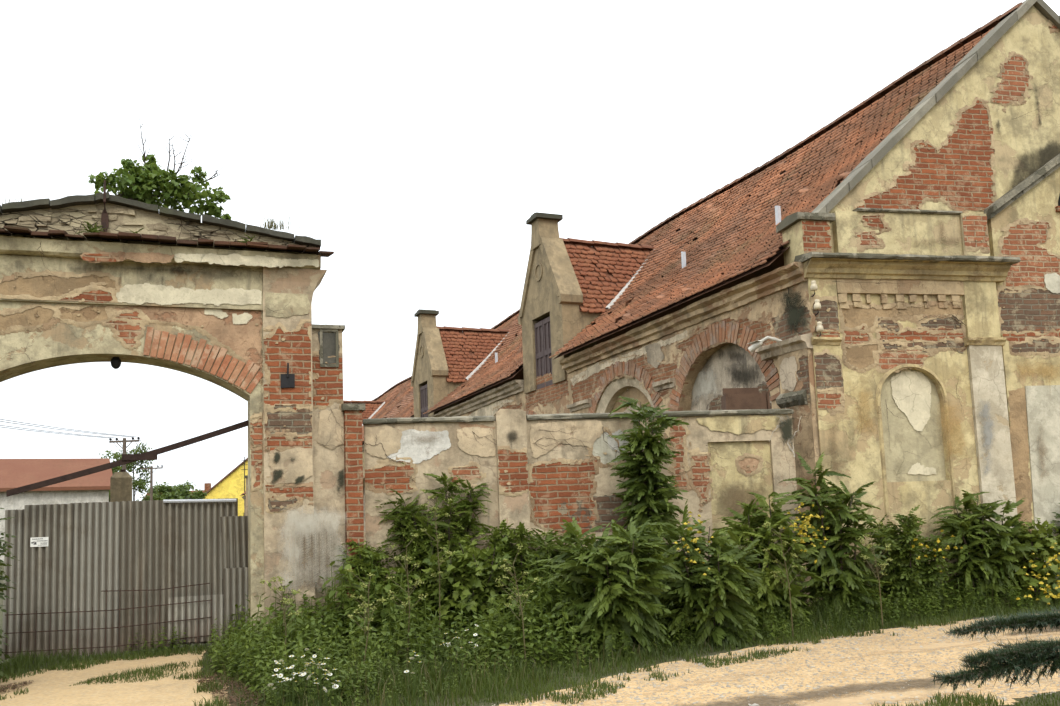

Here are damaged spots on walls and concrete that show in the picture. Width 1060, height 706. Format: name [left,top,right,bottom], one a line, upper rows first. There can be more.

flaking render [854,51,1060,359]
spalling [0,251,344,514]
flaking render [365,424,418,495]
crack [533,430,628,464]
damp [692,371,716,400]
flaking render [448,294,967,541]
damp [728,368,758,384]